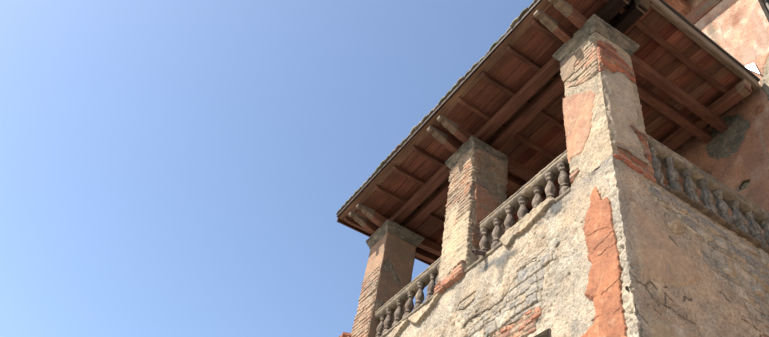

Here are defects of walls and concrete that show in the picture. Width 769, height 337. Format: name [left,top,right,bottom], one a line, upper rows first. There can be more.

spalling [565,33,636,88]
spalling [706,57,769,161]
spalling [458,294,475,310]
spalling [468,243,557,337]
flaking render [581,187,629,337]
spalling [613,125,769,337]